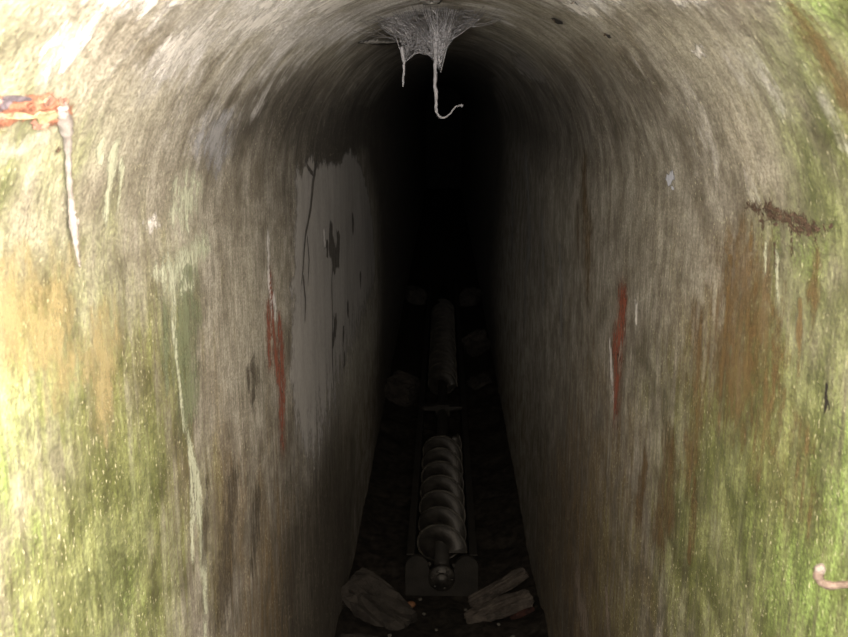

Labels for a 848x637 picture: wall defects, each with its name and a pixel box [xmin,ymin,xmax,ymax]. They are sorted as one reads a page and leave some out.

corrosion [266,272,286,449]
corrosion [612,282,628,429]